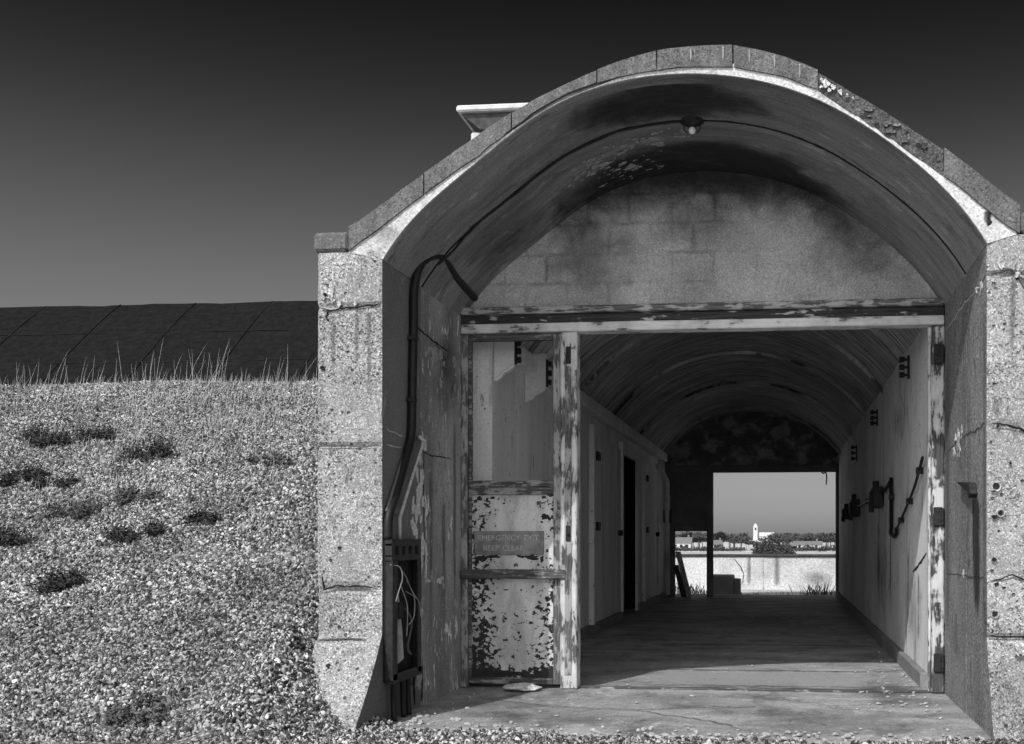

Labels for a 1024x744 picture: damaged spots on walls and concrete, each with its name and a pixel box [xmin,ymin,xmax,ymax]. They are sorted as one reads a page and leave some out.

peeling [551,127,690,192]
crack [319,301,379,322]
crack [418,327,449,361]
crack [948,422,1024,451]
peeling [473,549,500,565]
crack [321,576,372,591]